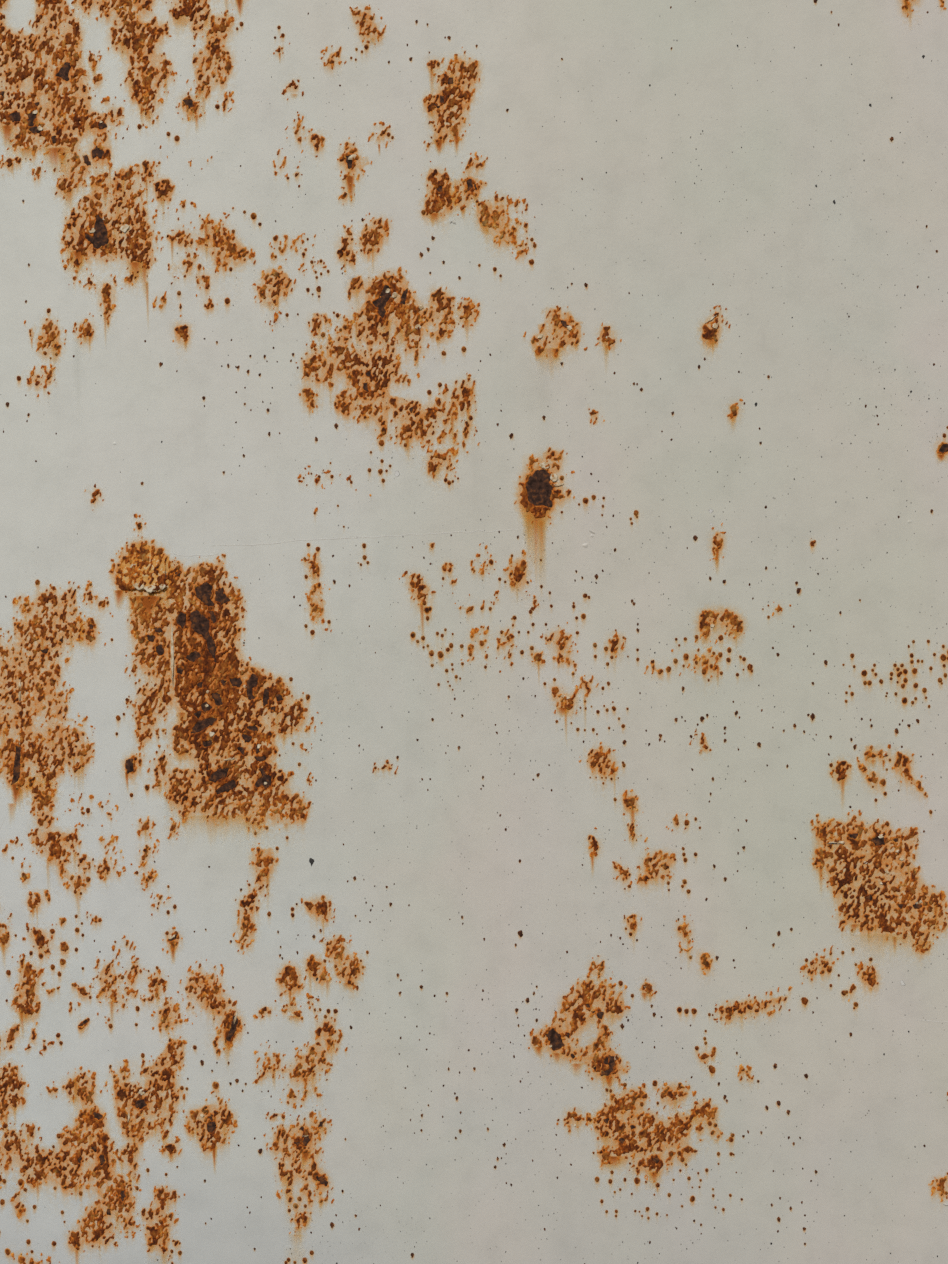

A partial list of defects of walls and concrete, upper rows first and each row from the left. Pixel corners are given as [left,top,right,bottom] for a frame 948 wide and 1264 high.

rust [902,0,947,17]
rust [421,36,537,265]
rust [0,0,480,485]
rust [297,462,371,497]
rust [514,447,614,537]
rust [710,523,726,562]
rust [675,714,739,754]
rust [0,543,369,1264]
rust [510,806,948,1230]